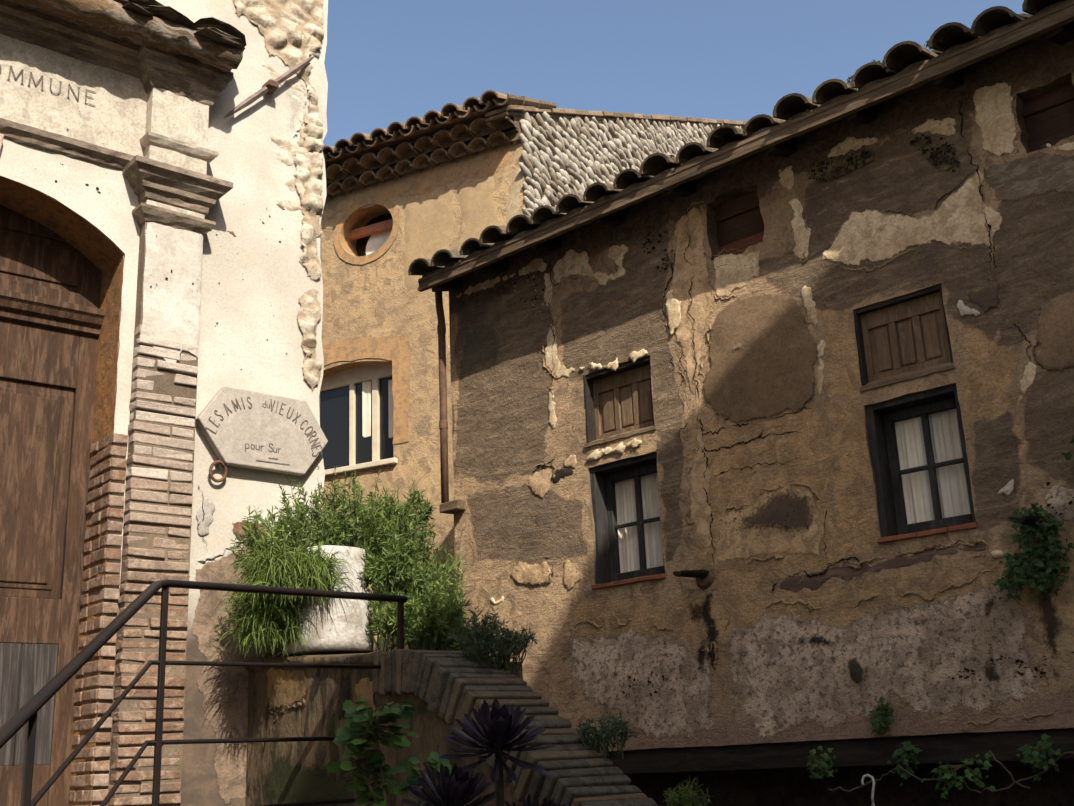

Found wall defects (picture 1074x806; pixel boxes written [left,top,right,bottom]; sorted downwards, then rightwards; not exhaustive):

flaking render [828,137,878,158]
flaking render [911,117,957,136]
crack [959,101,978,170]
flaking render [971,82,1019,157]
flaking render [779,164,1002,277]
peeling [456,201,822,565]
crack [700,406,811,562]
damp [697,593,719,671]
damp [791,636,831,648]
flaking render [570,550,1055,742]
damp [848,659,863,683]
damp [985,656,1000,680]